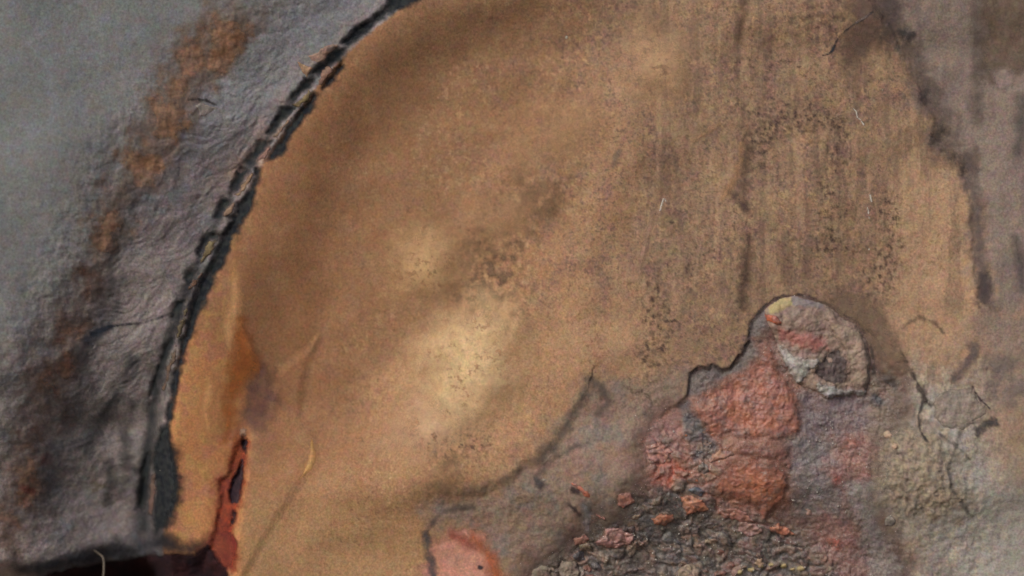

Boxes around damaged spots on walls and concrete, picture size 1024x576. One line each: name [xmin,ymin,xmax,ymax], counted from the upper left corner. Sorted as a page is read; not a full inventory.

corrosion [122,11,254,188]
peeling [298,44,338,77]
water stain [845,0,899,64]
corrosion [208,429,248,569]
spalling [422,506,502,576]
spalling [524,294,908,576]
crack [901,352,968,513]